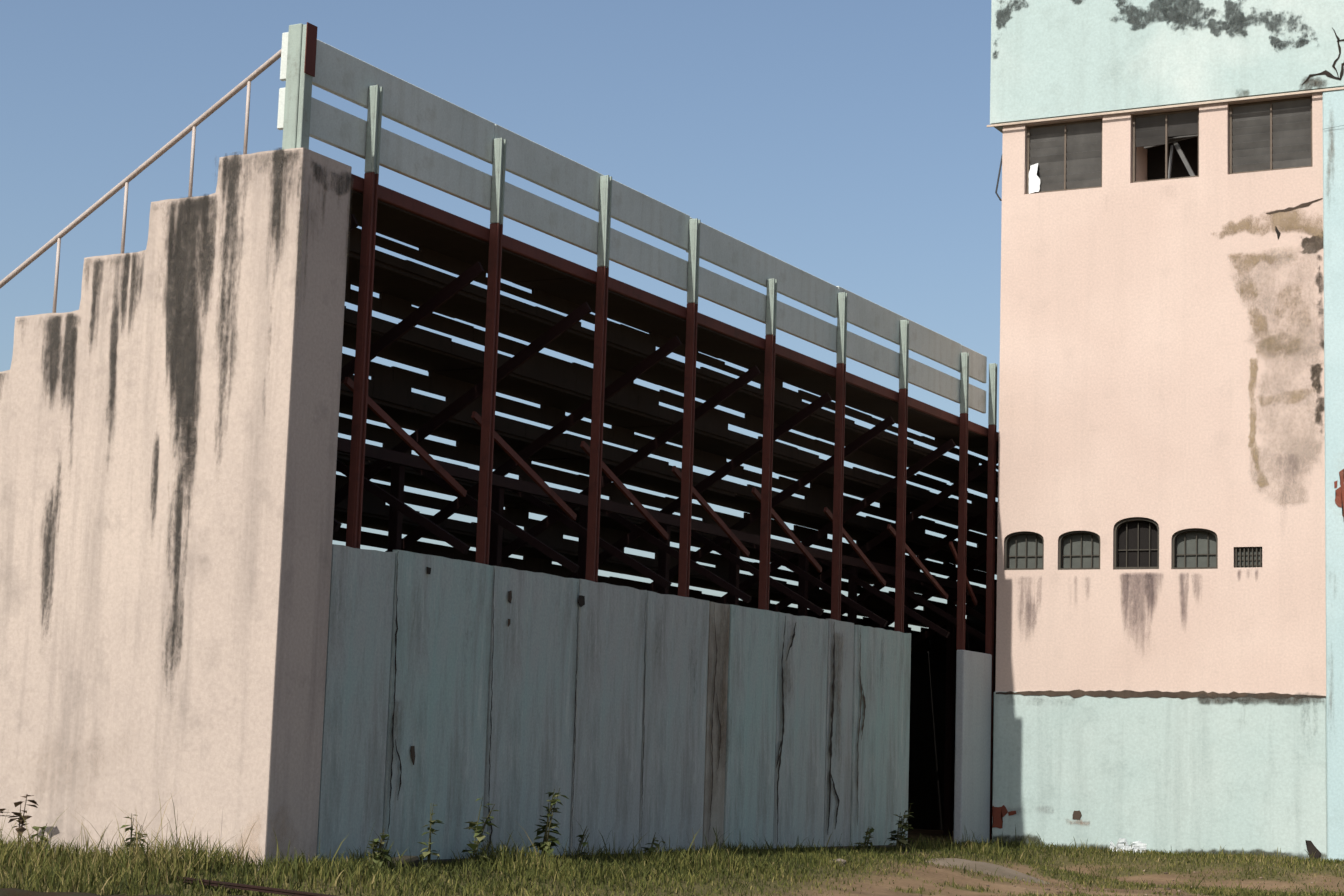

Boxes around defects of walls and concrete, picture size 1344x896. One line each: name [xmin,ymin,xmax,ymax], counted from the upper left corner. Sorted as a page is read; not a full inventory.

crack [1302,28,1344,90]
damp [272,148,321,284]
damp [44,254,142,429]
damp [164,153,241,668]
peeling [1221,198,1324,487]
damp [42,481,59,618]
damp [1123,574,1154,620]
peeling [1334,469,1344,519]